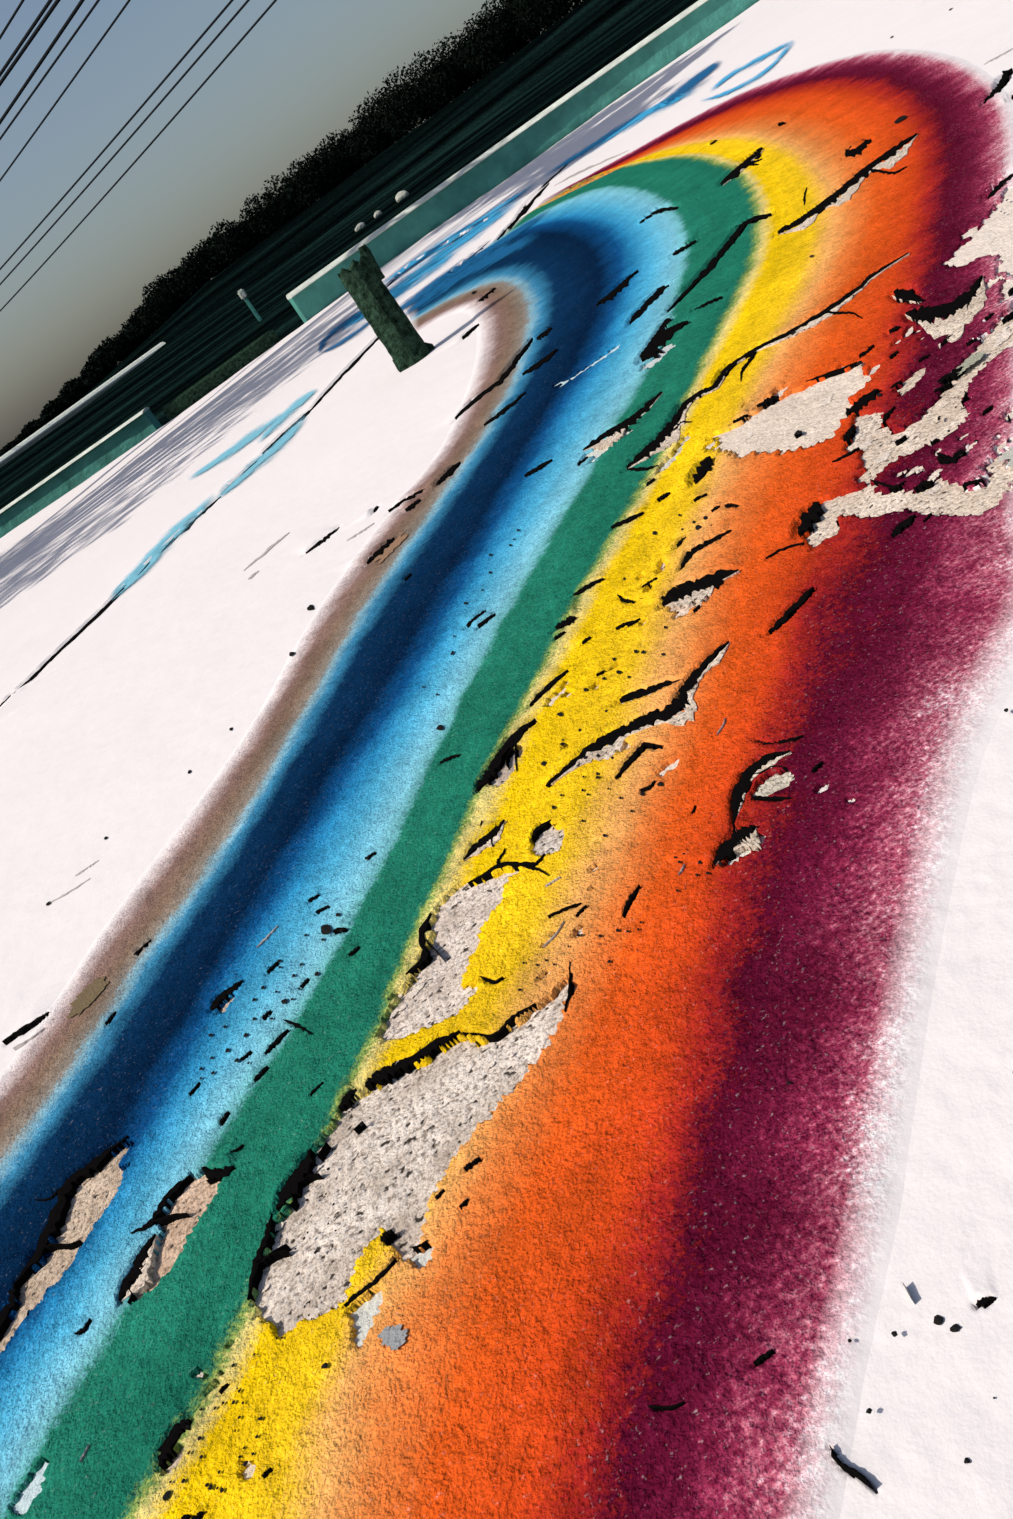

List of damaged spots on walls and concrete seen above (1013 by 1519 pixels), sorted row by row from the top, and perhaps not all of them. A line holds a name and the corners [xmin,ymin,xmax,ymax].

crack [983,48,1013,120]
spalling [779,134,918,235]
spalling [629,253,910,472]
spalling [584,393,664,462]
spalling [664,571,740,629]
crack [244,133,1013,1307]
peeling [674,752,795,876]
spalling [304,913,343,941]
peeling [382,871,518,1041]
peeling [255,984,577,1348]
peeling [0,1147,129,1353]
peeling [121,1174,220,1302]